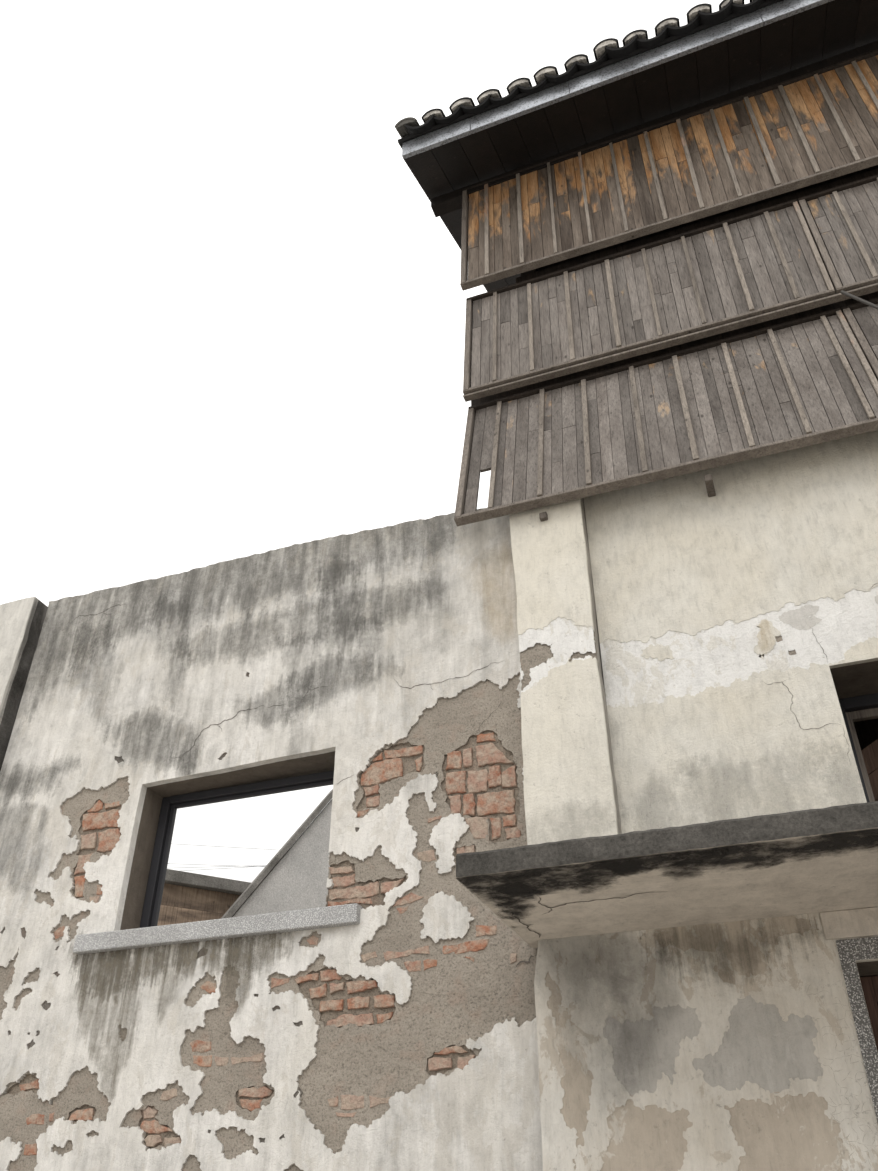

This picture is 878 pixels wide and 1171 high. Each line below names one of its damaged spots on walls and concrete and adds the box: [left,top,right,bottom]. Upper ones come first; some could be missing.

water stain [40,599,111,686]
water stain [127,576,170,622]
water stain [183,540,318,617]
water stain [319,534,351,581]
spalling [35,777,130,950]
spalling [254,586,878,1171]
water stain [456,829,878,928]
spalling [0,953,60,1035]
water stain [73,932,290,1086]
spalling [121,965,275,1160]
spalling [0,1066,111,1171]
spalling [182,1155,202,1171]